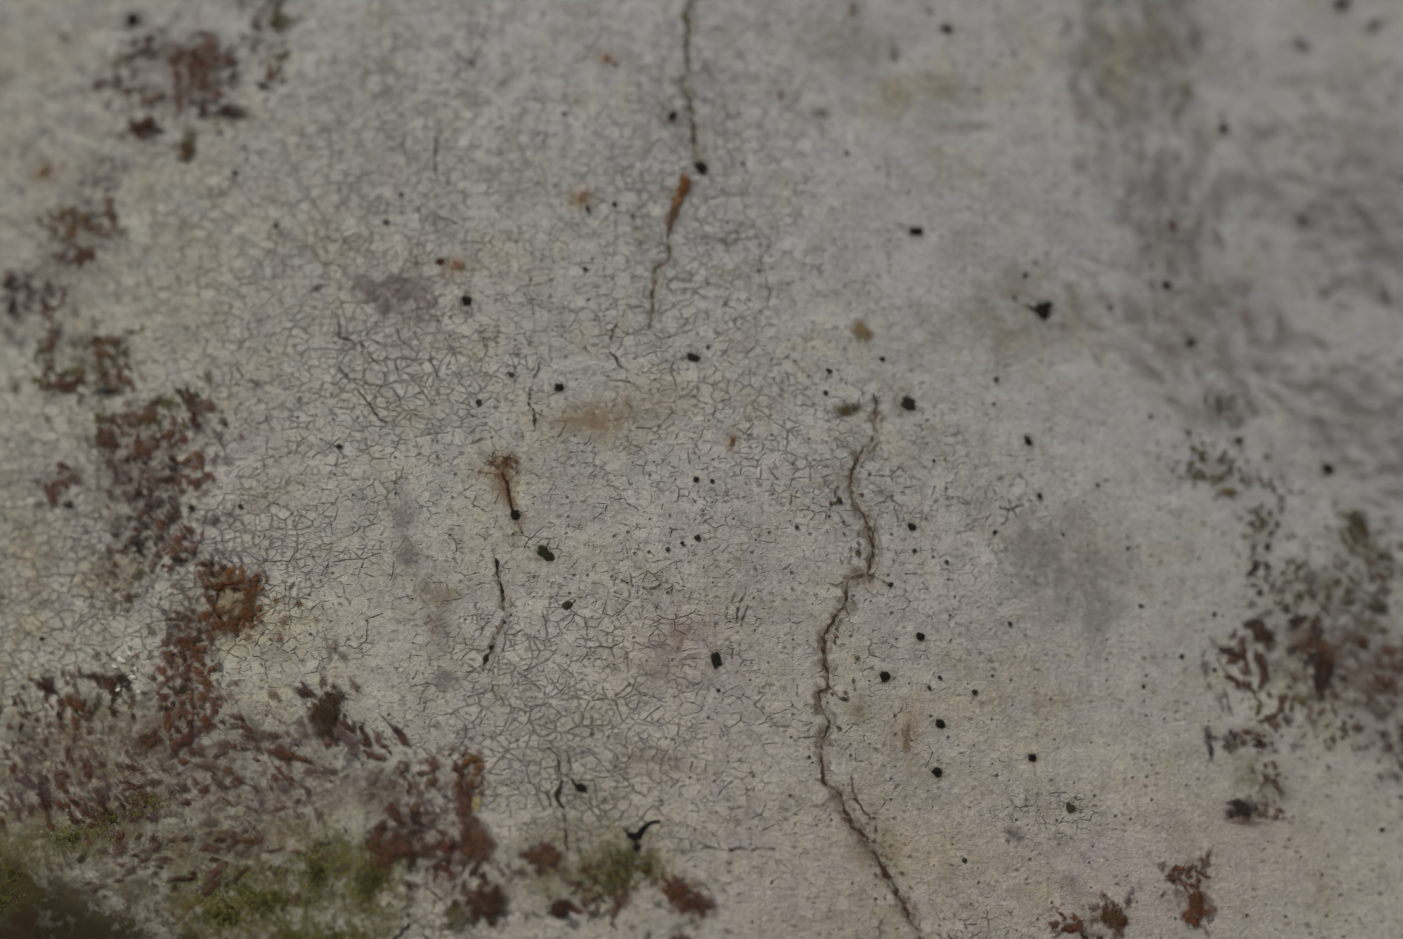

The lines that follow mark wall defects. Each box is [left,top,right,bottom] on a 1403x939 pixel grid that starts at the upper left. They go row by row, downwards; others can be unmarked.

crack [679,0,702,165]
rust [668,173,690,231]
crack [609,213,678,367]
crack [336,315,438,423]
crack [528,361,540,426]
crack [471,438,523,533]
crack [214,583,244,621]
crack [482,551,512,671]
crack [735,594,747,626]
crack [813,393,952,939]
crack [545,748,586,851]
crack [700,832,775,851]